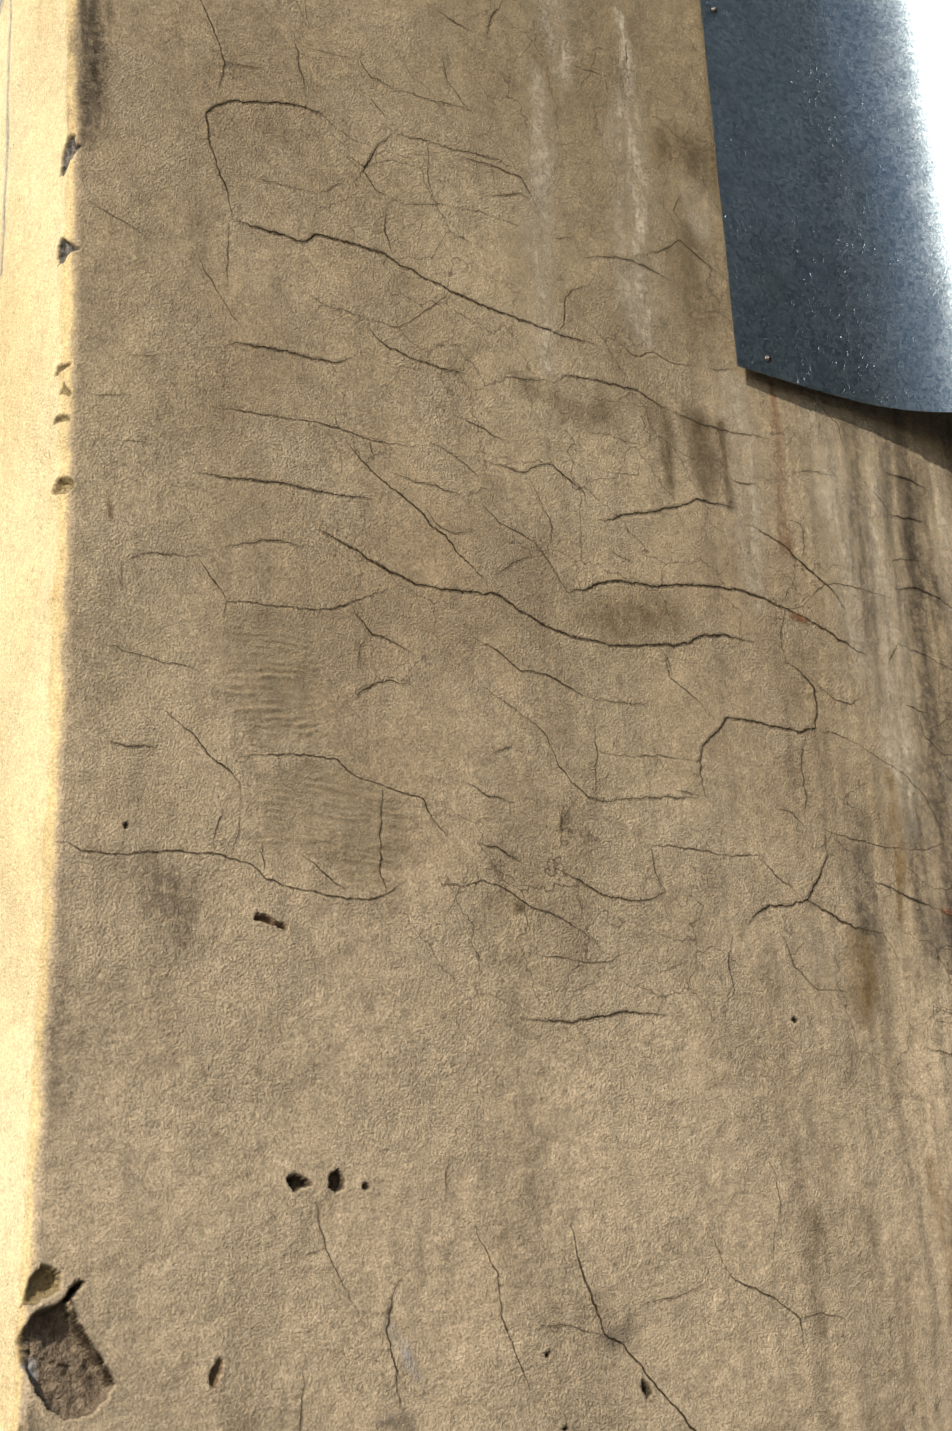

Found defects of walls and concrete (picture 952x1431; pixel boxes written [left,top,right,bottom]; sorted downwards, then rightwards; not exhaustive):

spalling [58,239,80,265]
spalling [61,135,81,176]
crack [198,0,760,437]
spalling [55,364,71,396]
spalling [53,478,75,495]
leakage [693,375,763,608]
crack [70,406,952,1008]
leakage [815,436,952,845]
crack [519,1011,661,1024]
spalling [18,1266,113,1420]
crack [386,1279,401,1400]
crack [545,1225,696,1431]